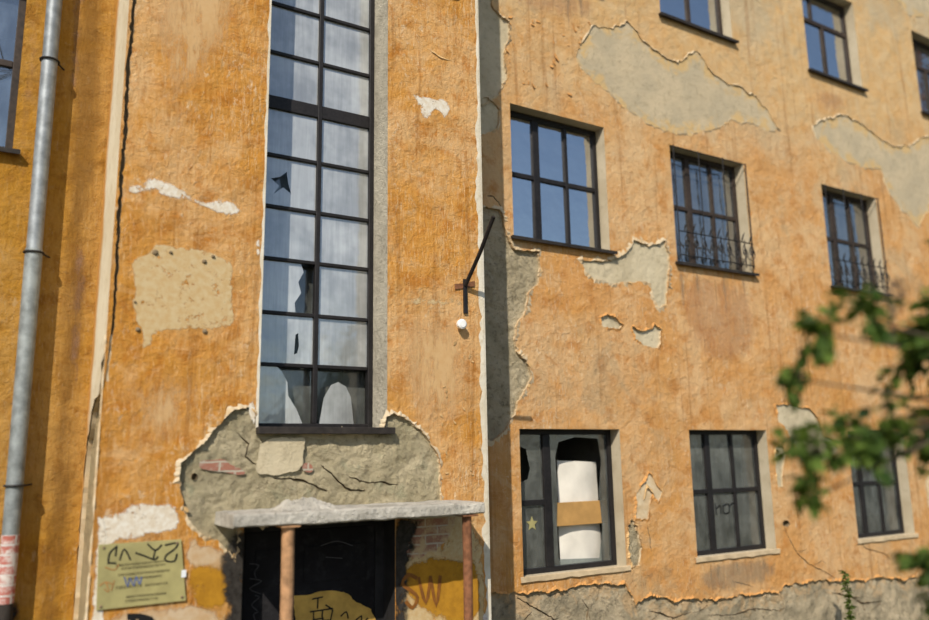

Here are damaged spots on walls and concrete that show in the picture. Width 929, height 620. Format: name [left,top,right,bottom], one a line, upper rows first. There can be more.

peeling [414,95,450,118]
crack [111,0,137,354]
peeling [129,178,239,214]
peeling [132,245,234,347]
flaking render [468,0,929,620]
crack [237,433,256,465]
flaking render [73,334,448,620]
crack [274,465,397,492]
flaking render [407,516,456,559]